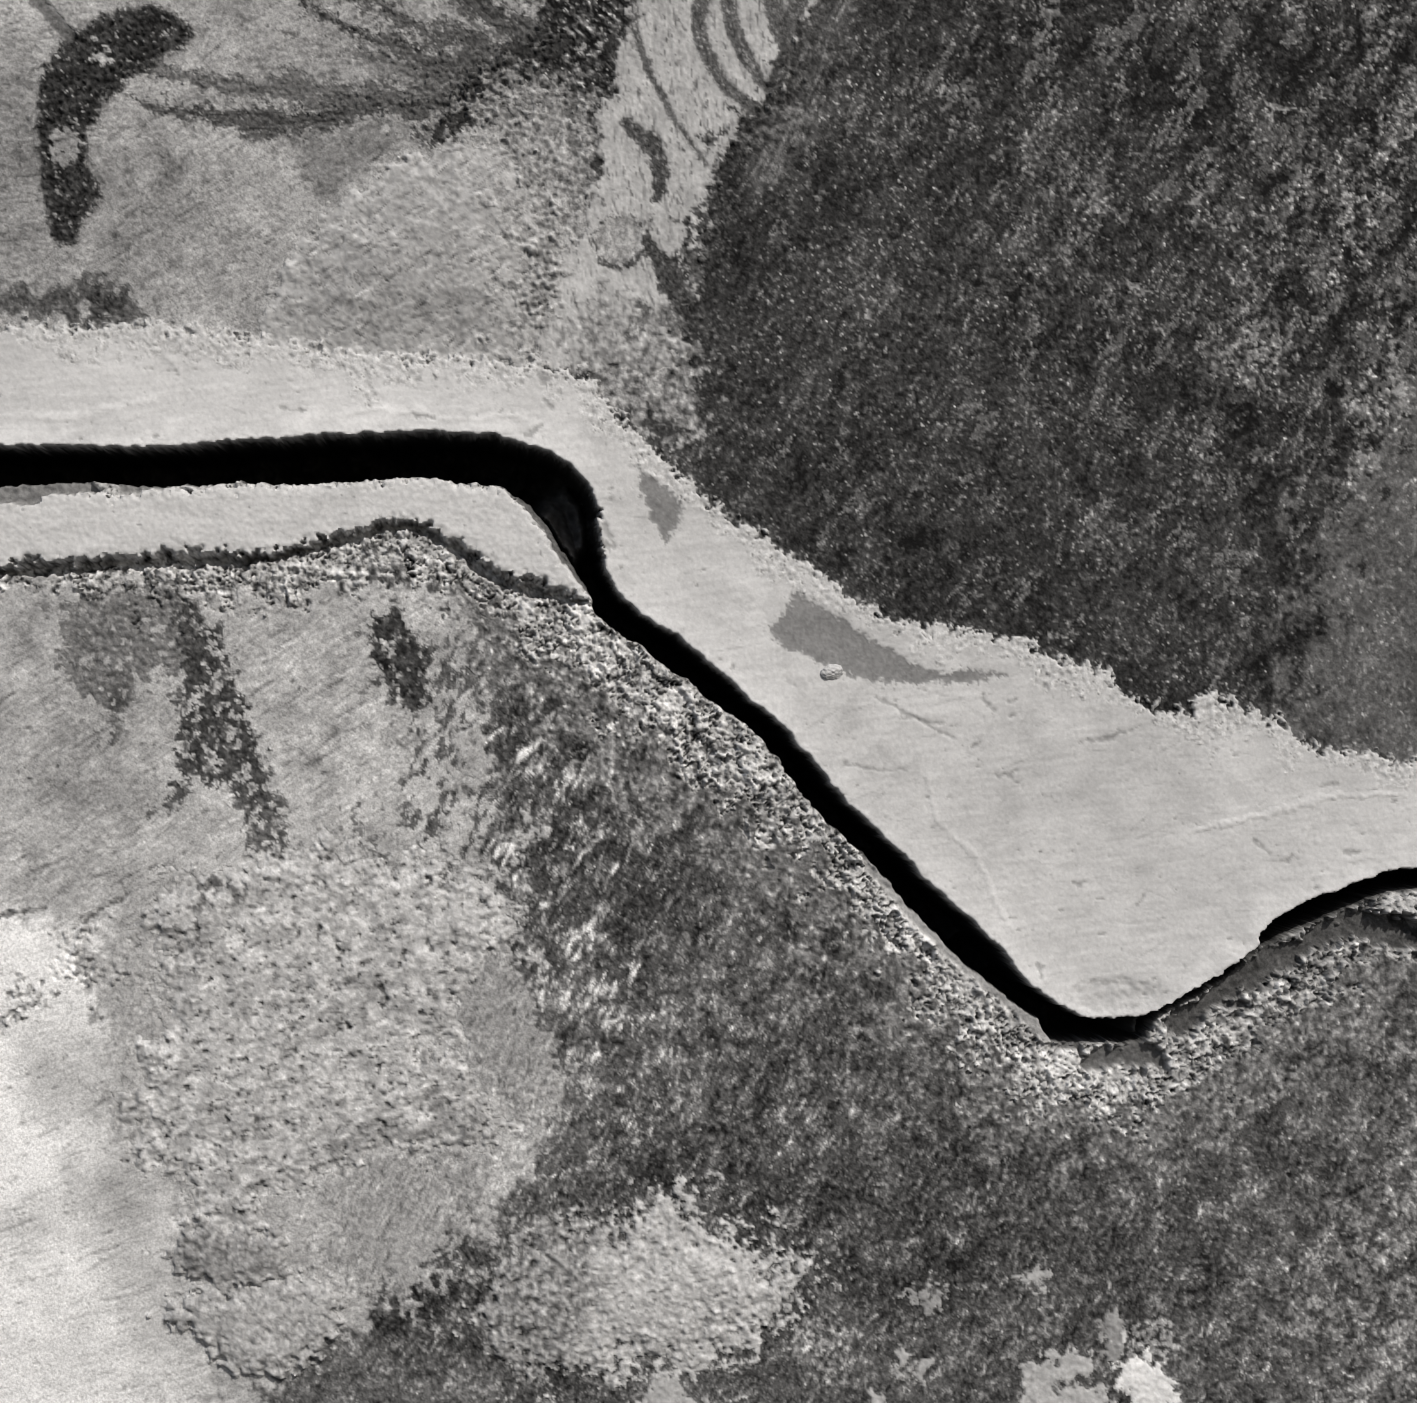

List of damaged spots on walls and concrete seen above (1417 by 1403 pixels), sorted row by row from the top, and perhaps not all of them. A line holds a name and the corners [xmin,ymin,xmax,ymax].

crack [0,429,1417,1044]